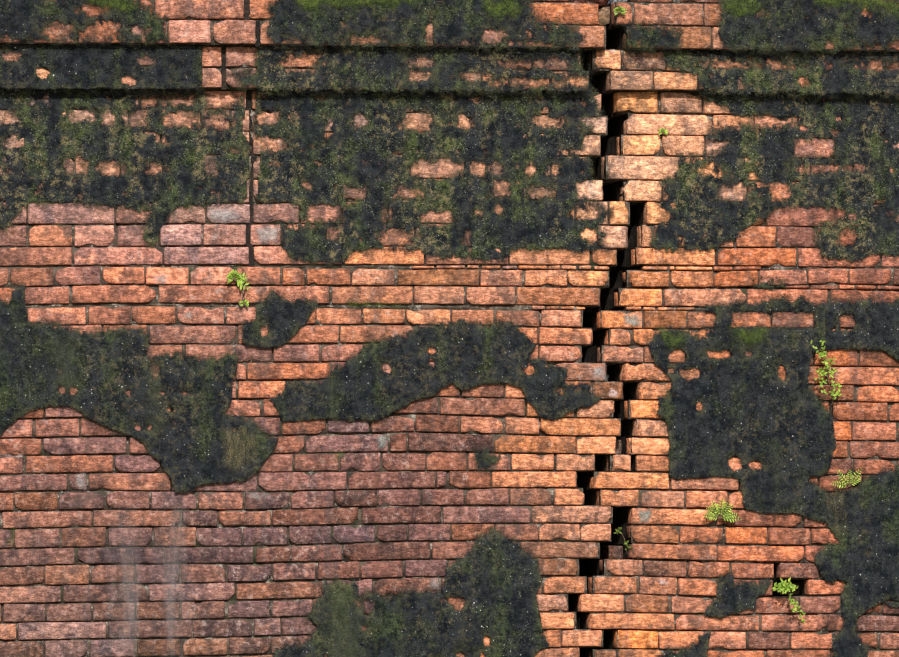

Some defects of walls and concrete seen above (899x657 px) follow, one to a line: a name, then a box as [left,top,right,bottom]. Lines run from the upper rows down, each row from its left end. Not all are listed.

crack [568,3,643,657]